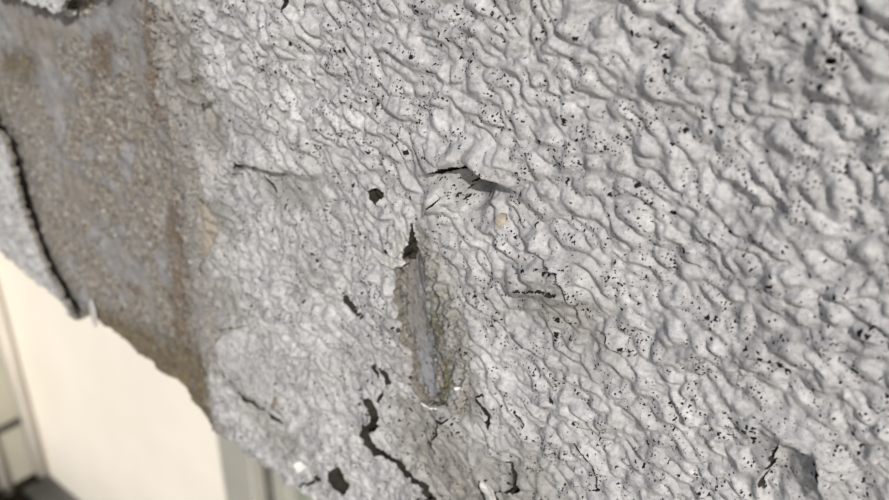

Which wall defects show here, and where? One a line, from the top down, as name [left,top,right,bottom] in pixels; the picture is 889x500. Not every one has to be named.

spalling [0,0,277,430]
spalling [372,230,463,410]
crack [358,364,437,500]
crack [426,419,448,454]
crack [475,394,491,430]
crack [477,461,521,500]